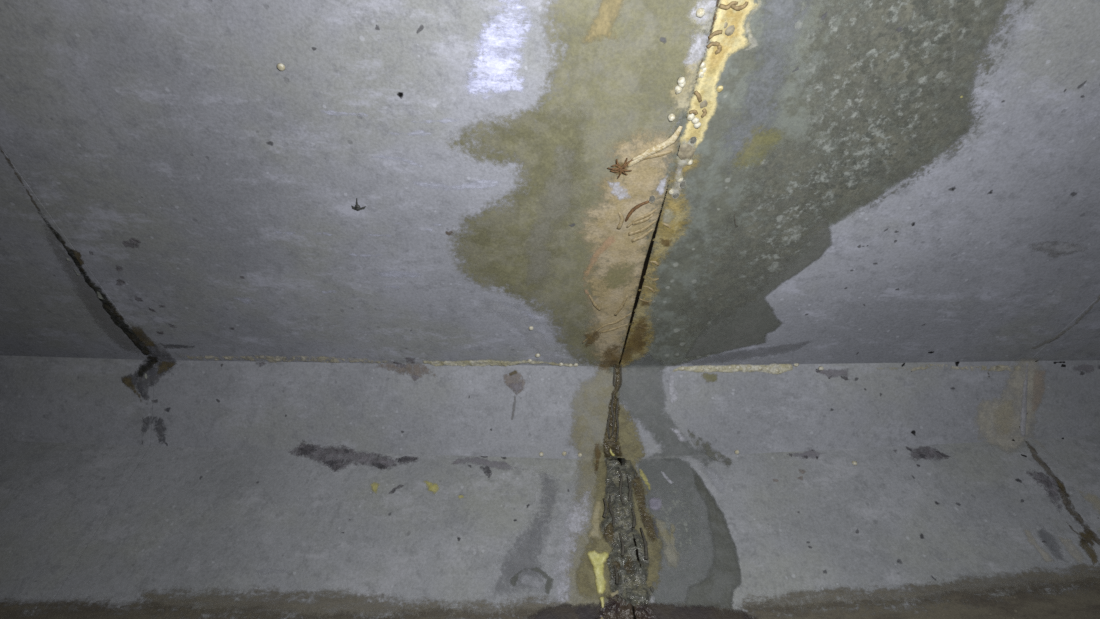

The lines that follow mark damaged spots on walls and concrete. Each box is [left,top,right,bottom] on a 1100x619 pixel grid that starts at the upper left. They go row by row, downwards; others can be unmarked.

crack [1,150,155,355]
crack [619,189,668,364]
damp [453,0,1013,368]
damp [674,345,799,382]
spalling [290,441,418,471]
damp [0,353,1100,619]
crack [1026,441,1100,565]